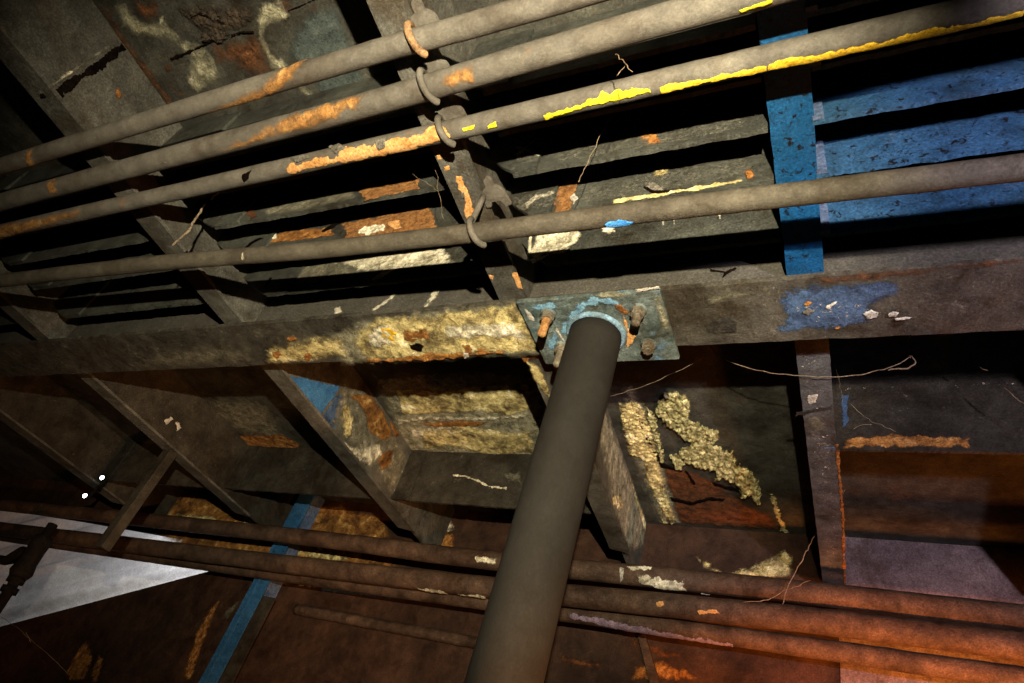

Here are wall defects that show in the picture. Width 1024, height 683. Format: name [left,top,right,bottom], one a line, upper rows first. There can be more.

crack [170,12,254,60]
rust [237,97,357,147]
rust [271,205,437,242]
water stain [268,289,537,363]
rust [615,304,636,349]
peeling [778,281,912,332]
water stain [379,371,543,454]
water stain [612,478,646,530]
rust [835,434,970,585]